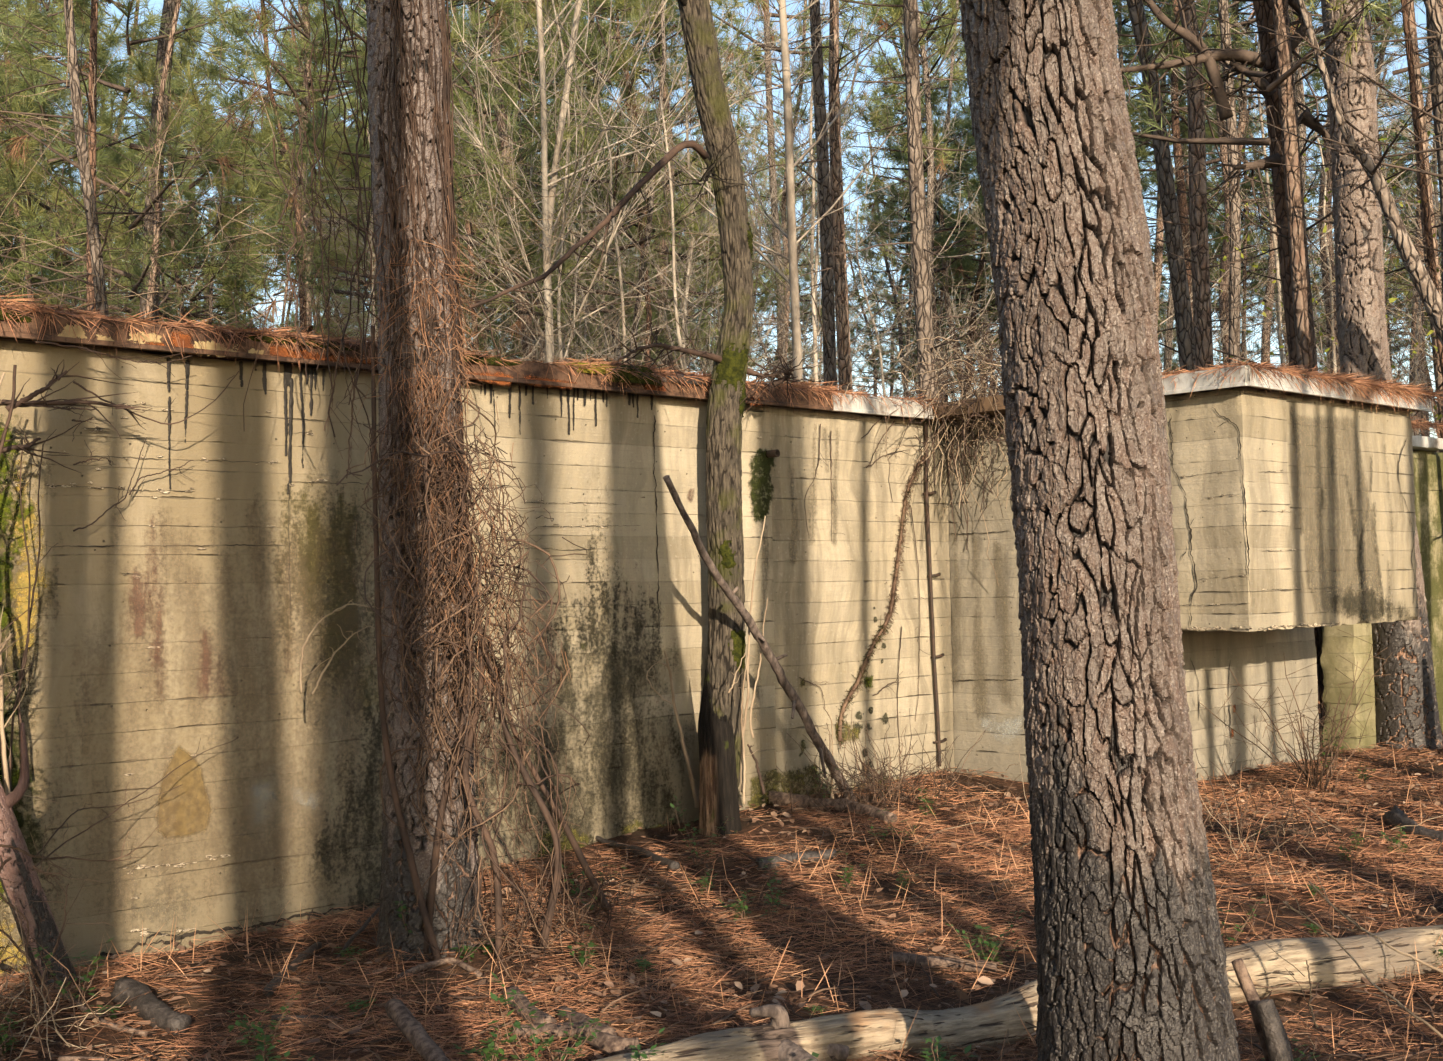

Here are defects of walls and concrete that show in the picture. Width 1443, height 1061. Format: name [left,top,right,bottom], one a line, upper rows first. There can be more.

leakage [166,357,190,489]
leakage [262,362,379,716]
leakage [0,490,56,784]
corrosion [130,567,161,660]
leakage [157,747,211,838]